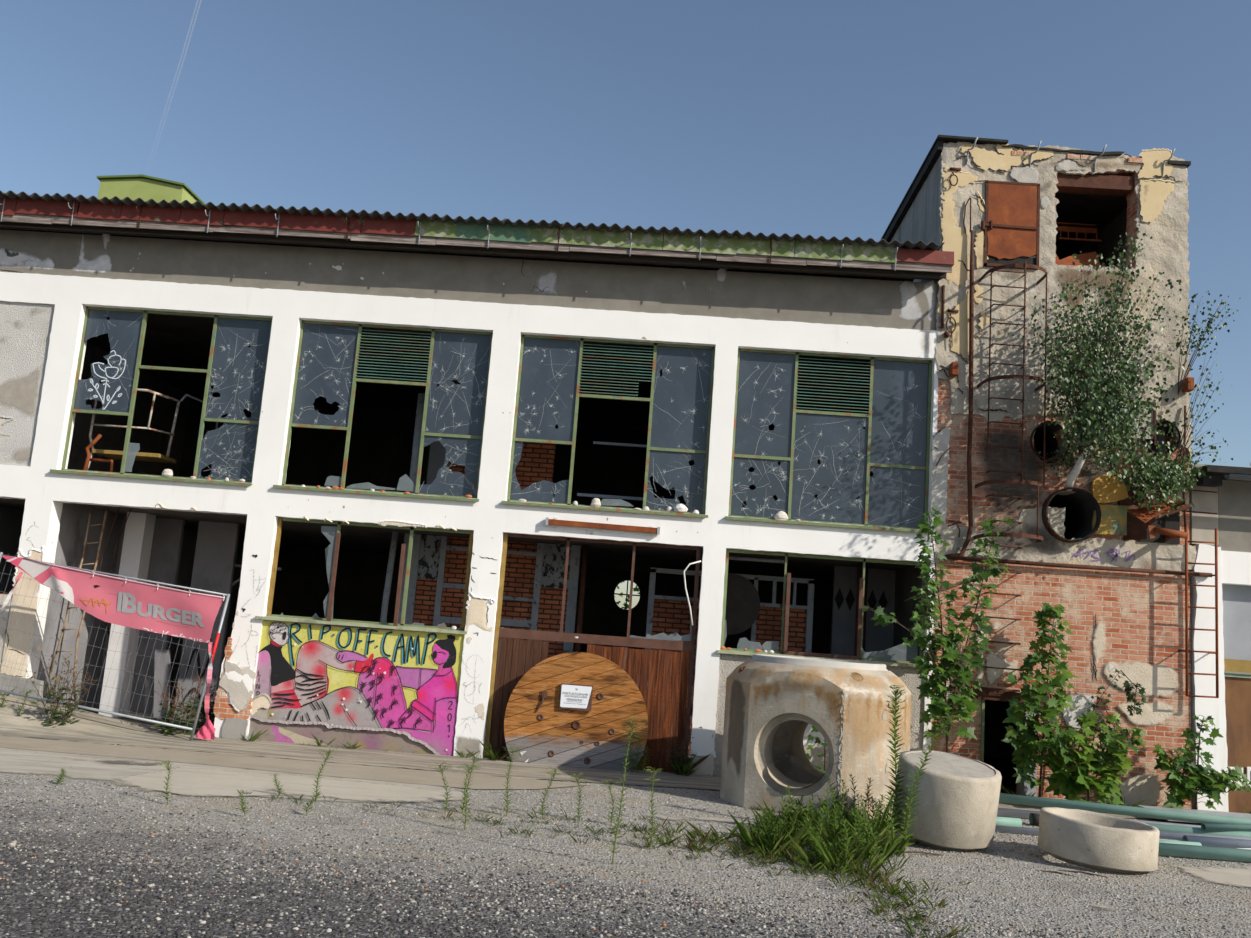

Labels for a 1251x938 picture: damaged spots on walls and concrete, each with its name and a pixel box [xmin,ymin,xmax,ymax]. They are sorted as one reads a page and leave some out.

peeling [1138,148,1175,223]
peeling [937,144,1054,363]
peeling [214,611,286,720]